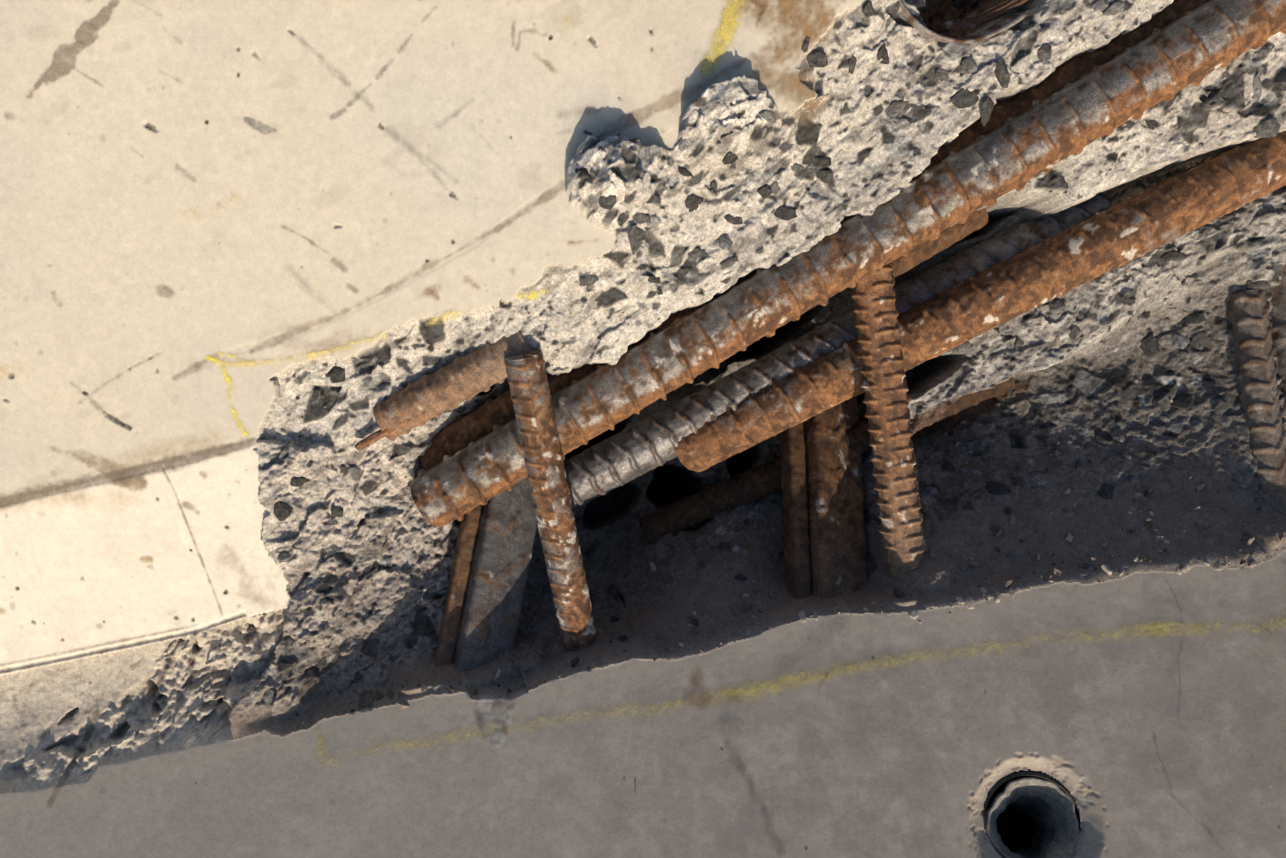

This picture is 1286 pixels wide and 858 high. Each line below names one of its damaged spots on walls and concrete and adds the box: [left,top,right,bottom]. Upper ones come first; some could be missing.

spalling [229,0,1286,740]
rust [740,0,830,110]